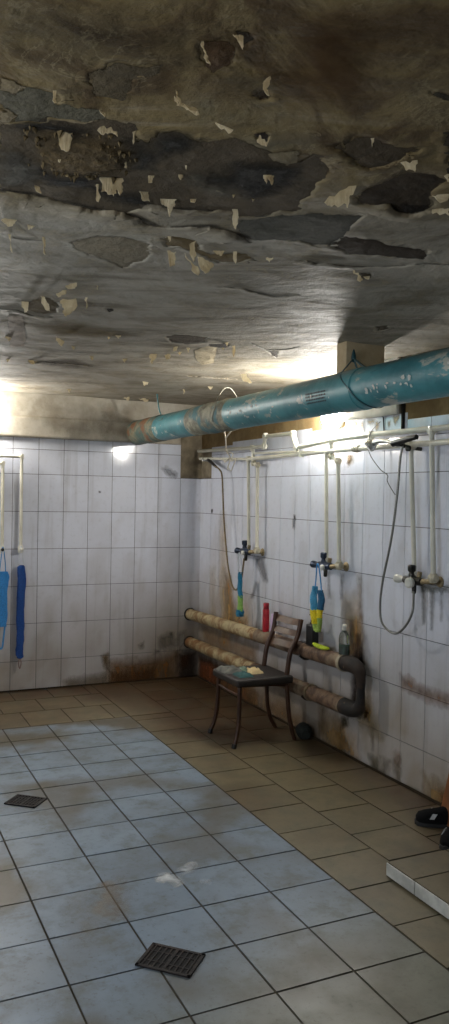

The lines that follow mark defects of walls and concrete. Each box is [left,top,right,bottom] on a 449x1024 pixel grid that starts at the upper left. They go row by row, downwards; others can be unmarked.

spalling [0,81,449,282]
spalling [149,332,235,364]
corrosion [66,651,299,726]